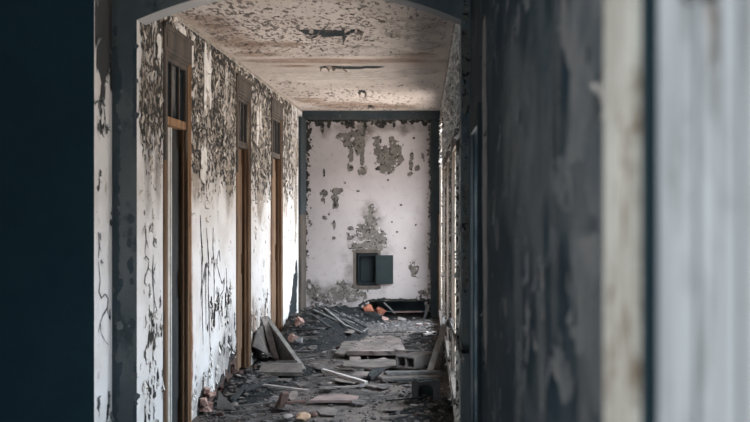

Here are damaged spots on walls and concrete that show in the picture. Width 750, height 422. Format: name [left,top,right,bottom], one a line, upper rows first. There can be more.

peeling [95,0,136,422]
peeling [131,0,470,422]
crack [98,232,109,345]
crack [144,229,157,315]
crack [200,215,228,335]